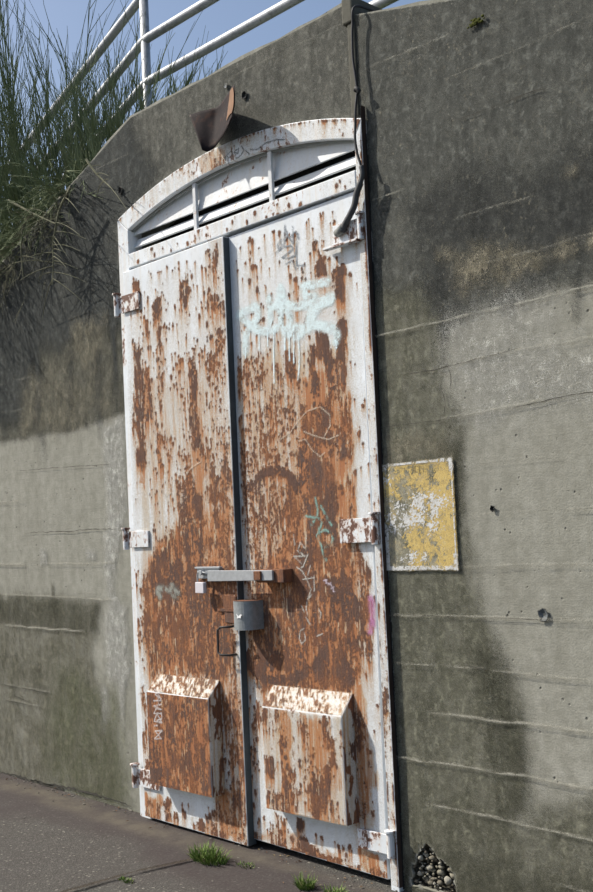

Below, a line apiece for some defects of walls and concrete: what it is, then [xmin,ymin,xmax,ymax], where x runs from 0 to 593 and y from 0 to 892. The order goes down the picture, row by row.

water stain [0,7,352,806]
rust [226,87,234,120]
rust [119,105,403,888]
peeling [382,457,459,571]
spalling [412,843,457,892]
water stain [355,0,593,892]